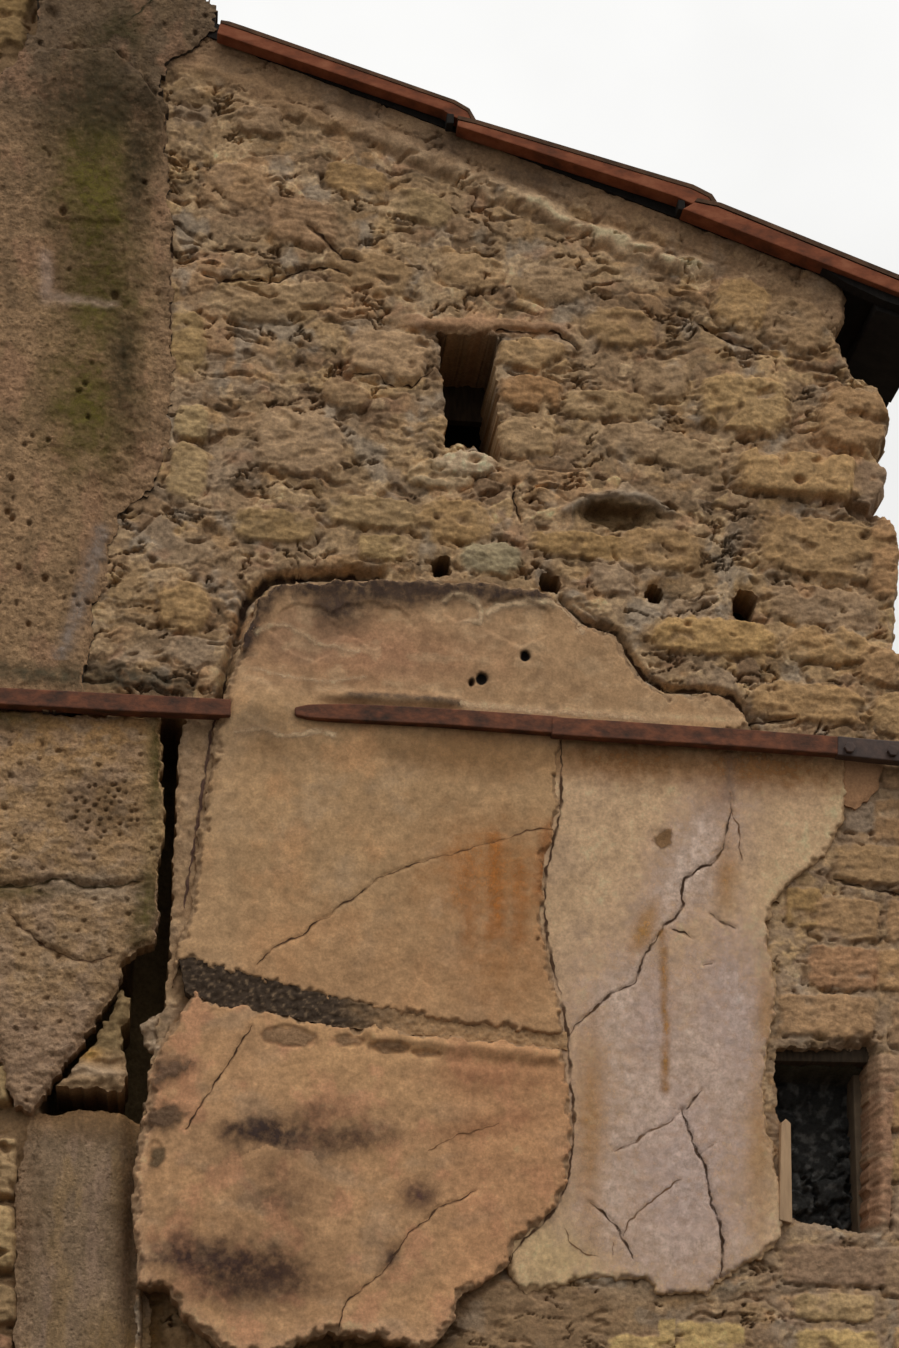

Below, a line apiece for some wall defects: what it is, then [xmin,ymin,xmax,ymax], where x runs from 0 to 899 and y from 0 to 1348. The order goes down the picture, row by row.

crack [257,741,743,1277]
crack [186,1025,252,1129]
crack [339,1191,474,1326]